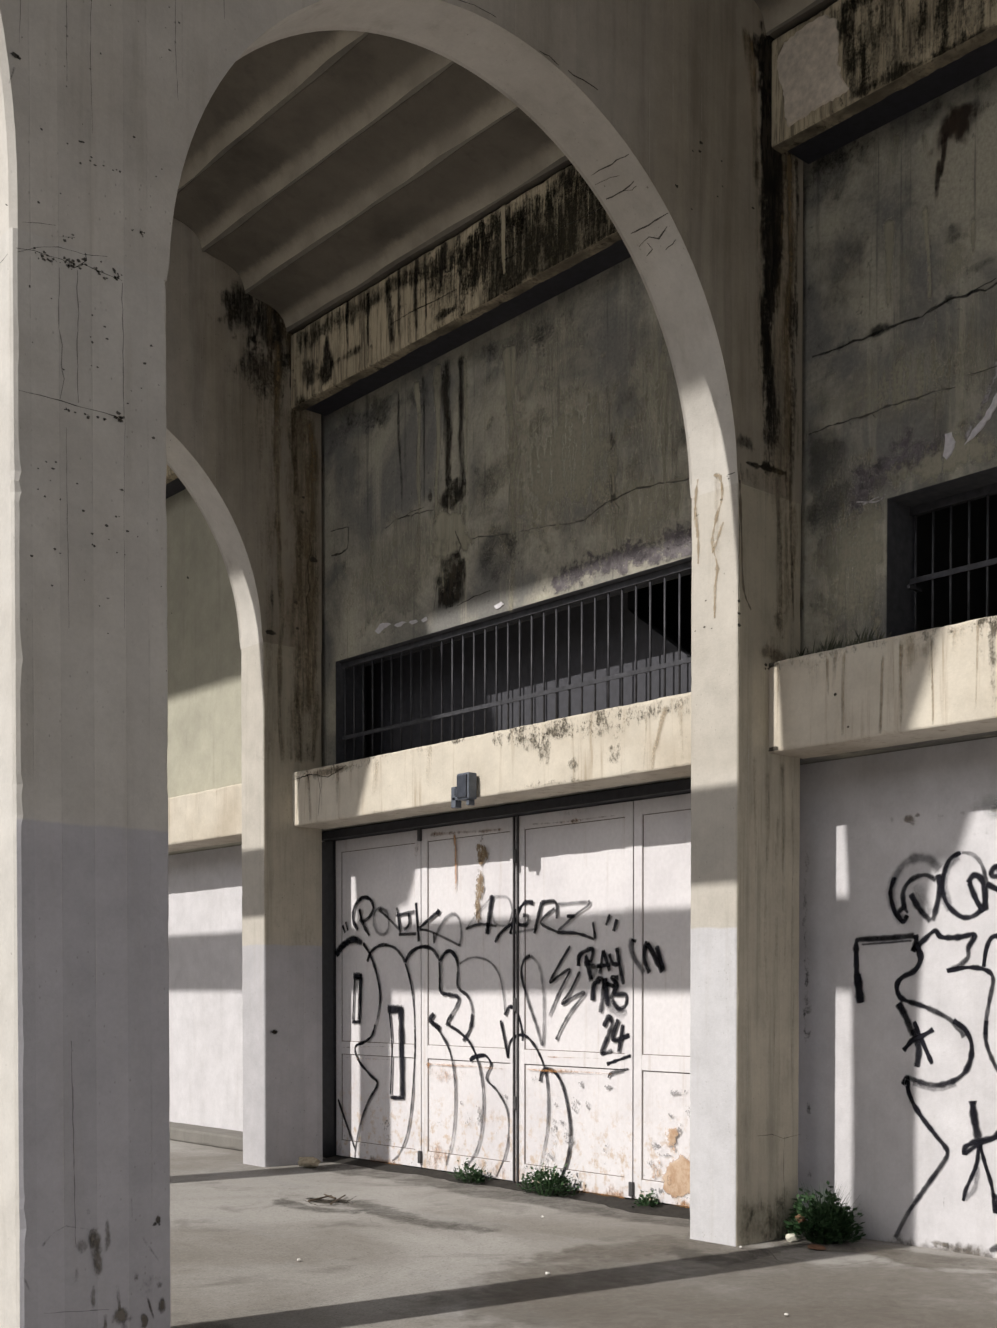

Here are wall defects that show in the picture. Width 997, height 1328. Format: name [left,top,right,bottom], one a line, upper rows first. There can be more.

water stain [837,0,996,97]
crack [18,222,122,281]
crack [504,154,636,260]
crack [631,213,676,256]
water stain [739,21,799,509]
crack [812,278,997,358]
water stain [853,102,997,411]
water stain [219,166,617,781]
water stain [357,318,724,618]
crack [472,478,689,539]
spalling [846,360,997,514]
peeling [649,1110,690,1198]